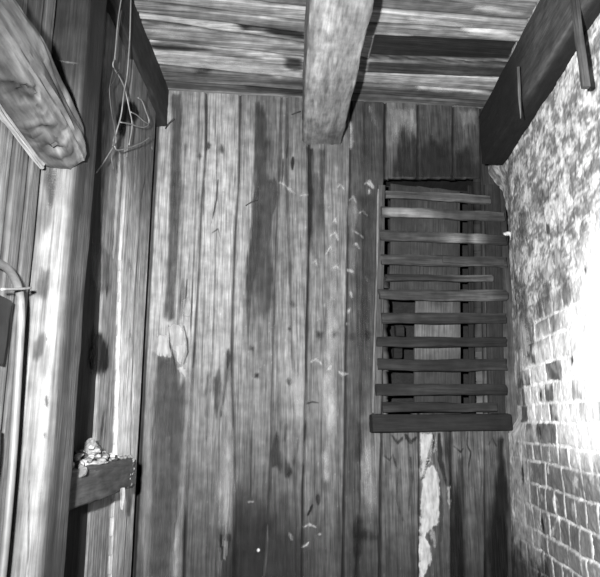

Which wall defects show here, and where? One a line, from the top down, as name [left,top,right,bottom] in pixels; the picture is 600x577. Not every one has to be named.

water stain [247,104,277,307]
peeling [156,324,186,377]
peeling [392,433,451,577]